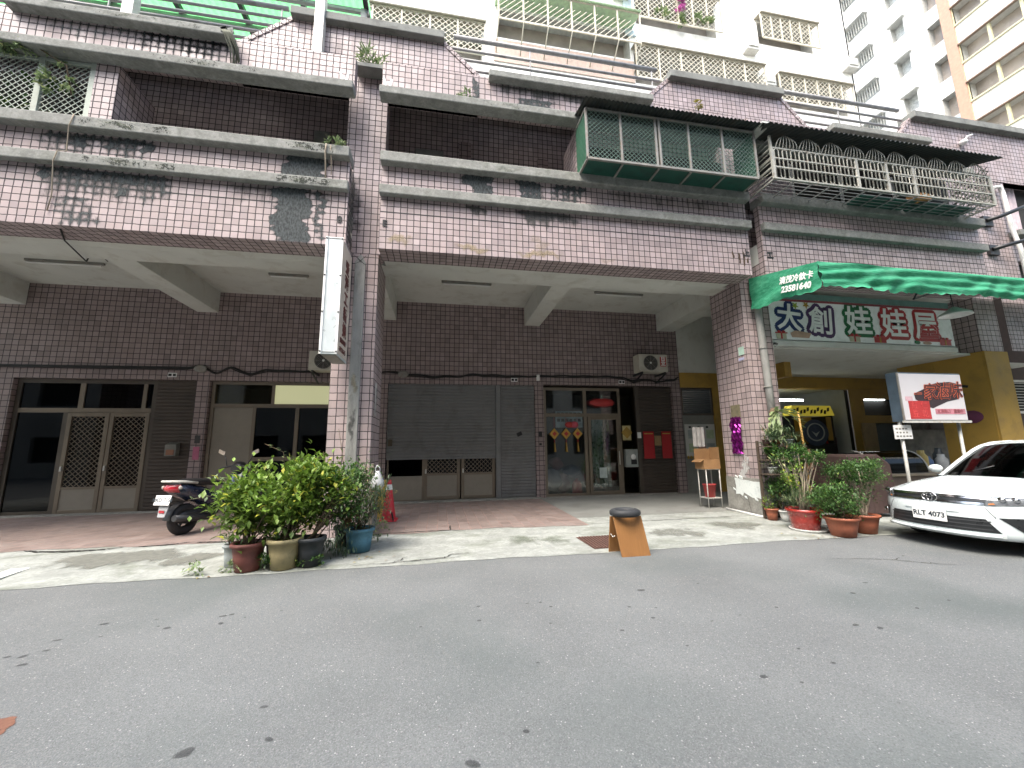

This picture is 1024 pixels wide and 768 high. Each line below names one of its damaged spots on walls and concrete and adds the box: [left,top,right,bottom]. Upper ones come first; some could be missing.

peeling [733,475,761,501]